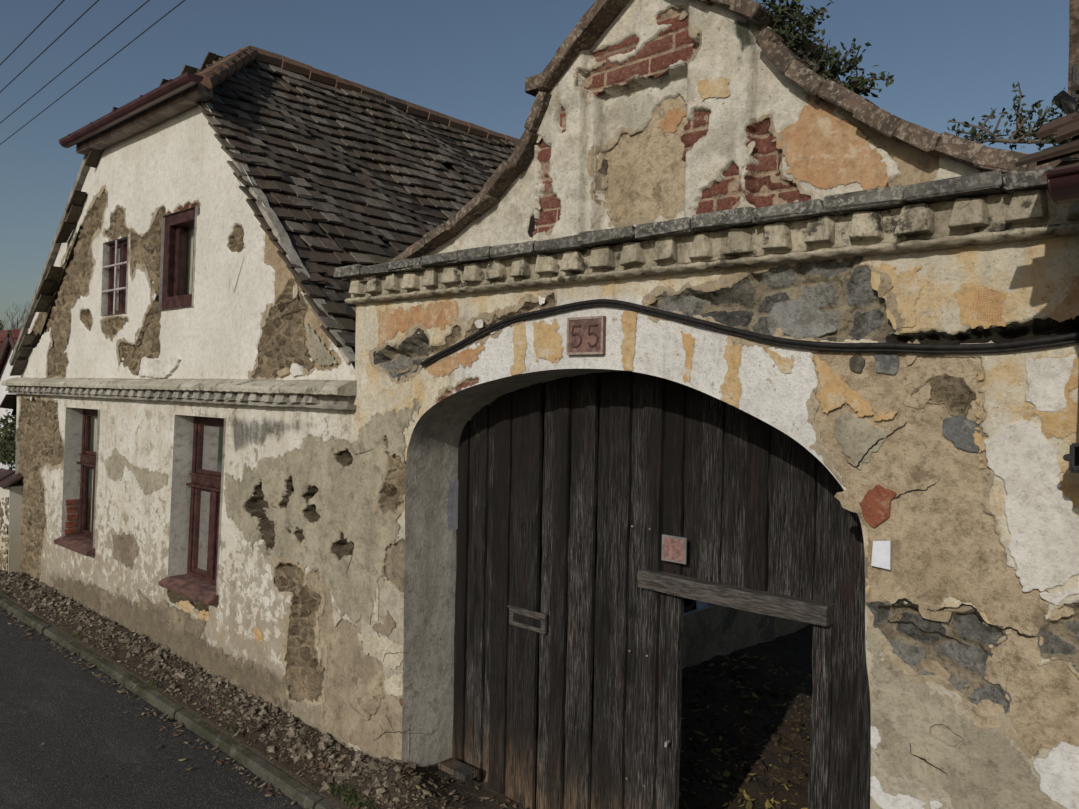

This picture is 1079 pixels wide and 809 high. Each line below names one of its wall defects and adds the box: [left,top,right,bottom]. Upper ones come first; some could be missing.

flaking render [573,5,702,100]
flaking render [528,136,562,237]
flaking render [586,77,939,228]
flaking render [28,185,200,379]
flaking render [248,233,341,380]
flaking render [369,288,563,403]
peeling [0,394,420,762]
peeling [446,478,458,531]
flaking render [620,257,1079,809]